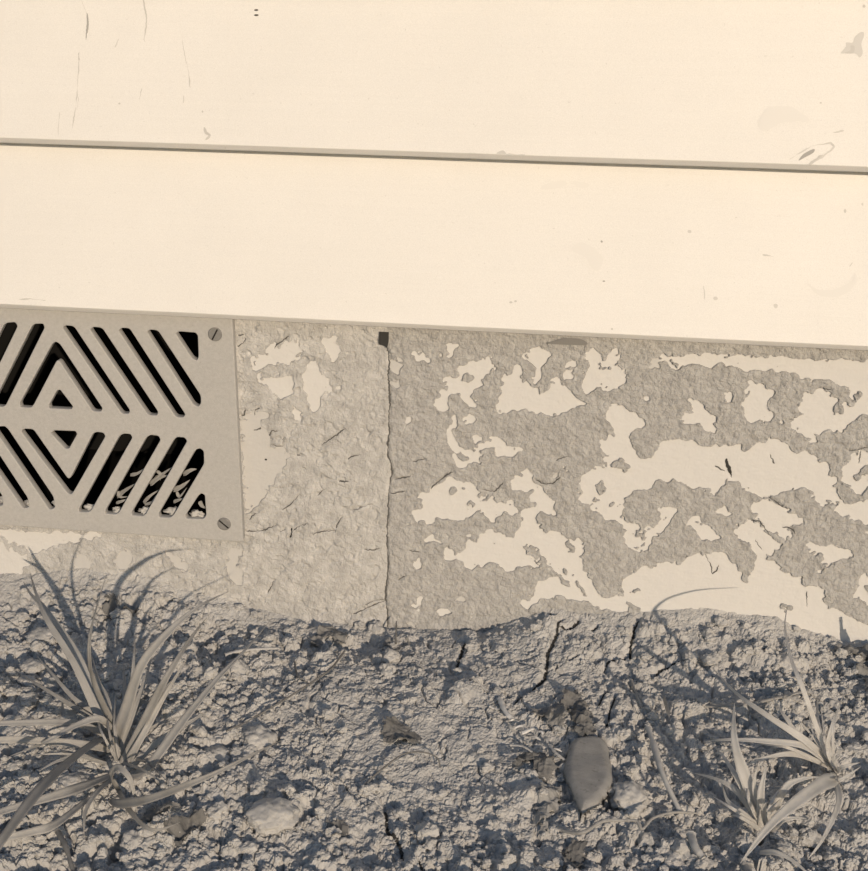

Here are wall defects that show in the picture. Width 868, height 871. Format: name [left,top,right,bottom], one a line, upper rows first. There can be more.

spalling [244,335,340,421]
spalling [321,327,344,362]
spalling [379,332,389,348]
spalling [390,343,459,388]
spalling [239,411,300,513]
crack [242,347,424,627]
spalling [406,346,868,643]
spalling [0,529,101,574]
spalling [110,548,135,573]